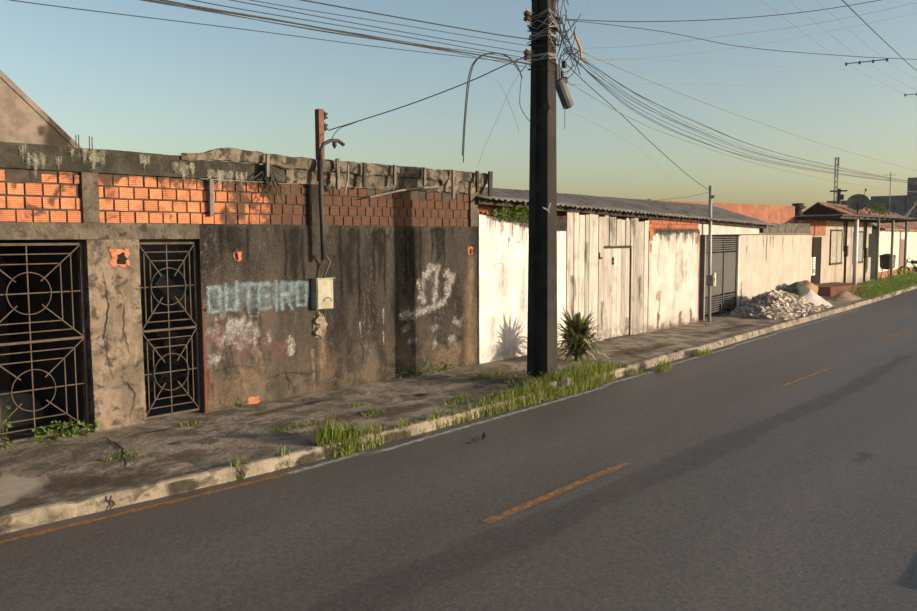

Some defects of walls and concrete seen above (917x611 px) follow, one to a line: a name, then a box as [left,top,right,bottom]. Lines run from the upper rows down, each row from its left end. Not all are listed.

leakage [71,148,105,168]
spalling [109,249,130,267]
leakage [339,228,361,304]
leakage [373,228,386,290]
leakage [404,228,446,288]
leakage [438,254,476,369]